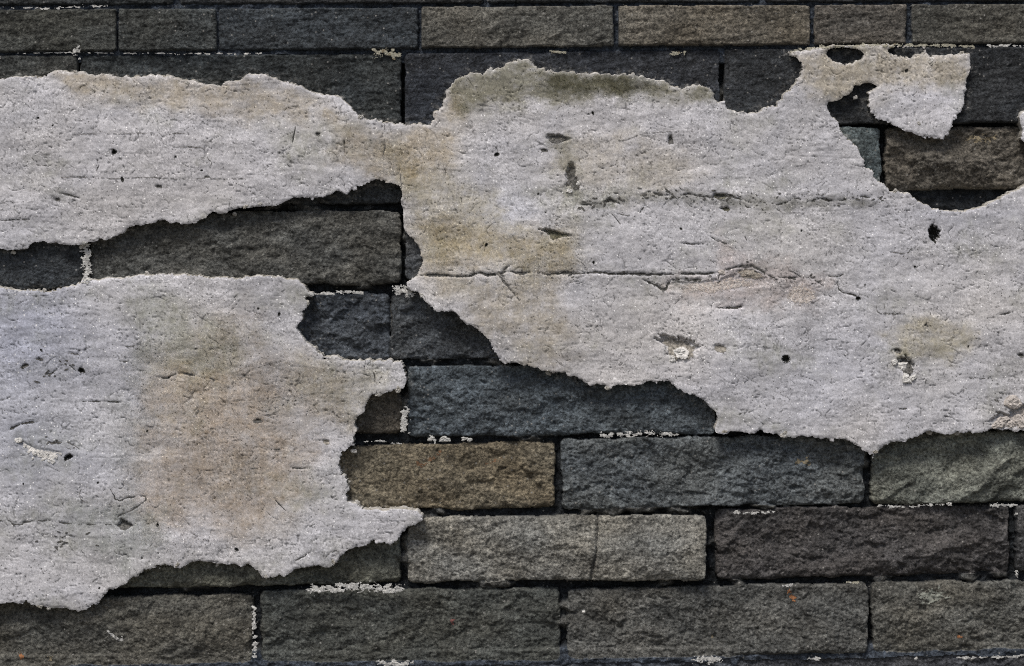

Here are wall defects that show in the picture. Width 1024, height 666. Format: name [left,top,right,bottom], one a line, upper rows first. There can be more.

peeling [0,43,970,126]
peeling [833,117,1024,212]
crack [577,187,886,211]
crack [421,253,905,315]
peeling [0,238,408,393]
spalling [661,338,695,363]
spalling [891,348,917,383]
spalling [991,395,1024,429]
peeling [338,422,424,518]